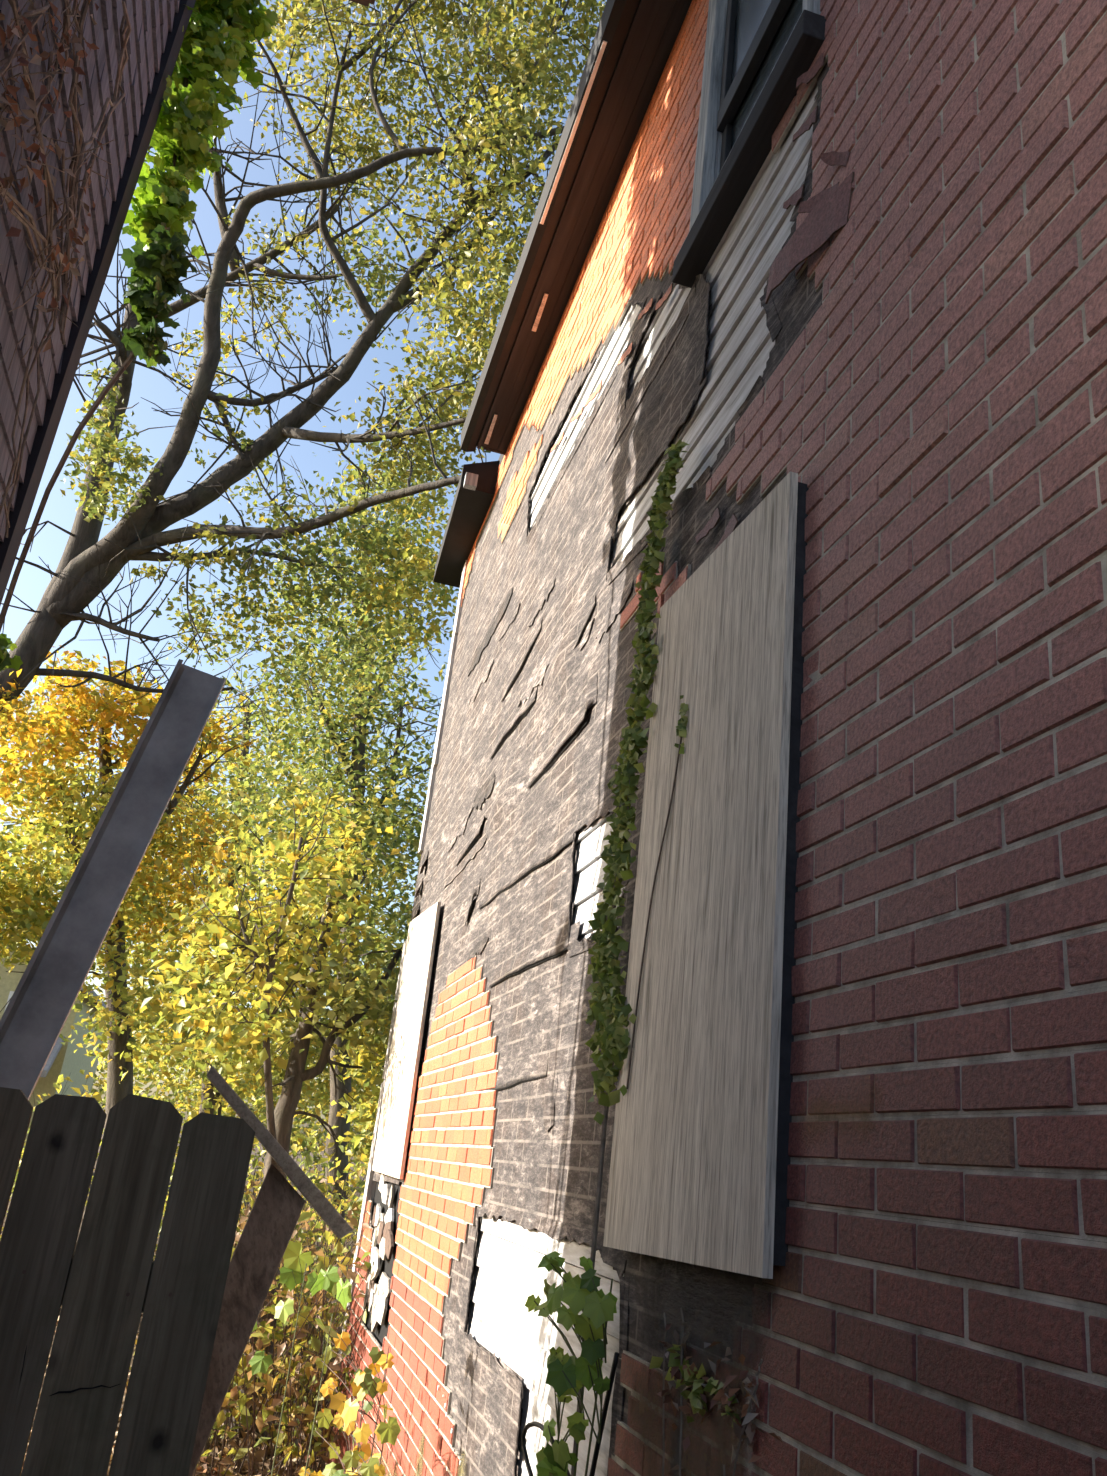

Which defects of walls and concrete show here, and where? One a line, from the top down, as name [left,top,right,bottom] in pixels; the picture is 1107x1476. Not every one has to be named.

peeling [759,290,782,342]
peeling [737,375,764,418]
peeling [466,578,555,706]
peeling [518,466,712,707]
peeling [695,508,739,552]
peeling [467,936,488,961]
spalling [363,1173,402,1347]
peeling [464,1203,630,1476]